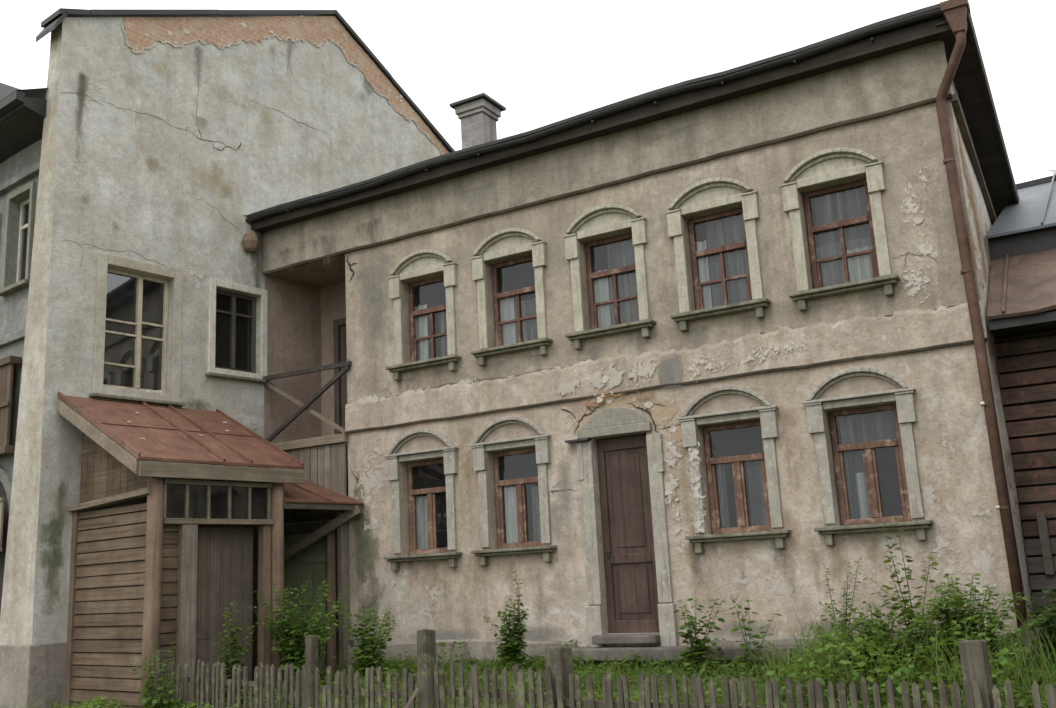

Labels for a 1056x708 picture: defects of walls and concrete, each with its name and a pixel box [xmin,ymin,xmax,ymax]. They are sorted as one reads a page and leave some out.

leakage [78,74,86,122]
crack [61,65,241,151]
flaking render [122,15,449,154]
peeling [894,159,938,305]
peeling [680,333,811,383]
crack [560,403,681,433]
flaking render [543,355,706,534]
leakage [42,484,64,594]